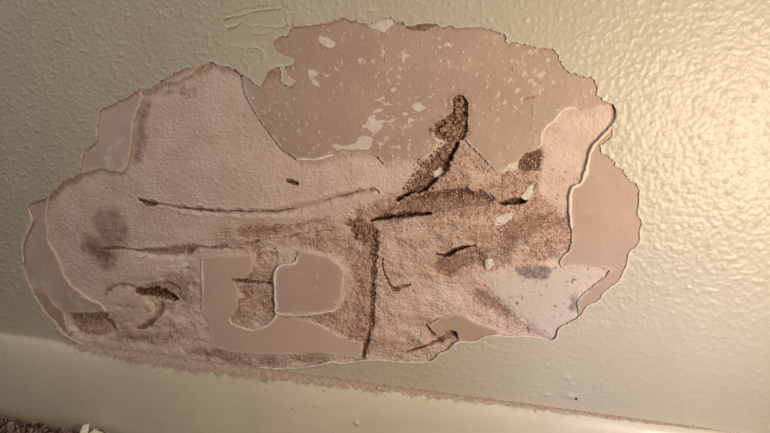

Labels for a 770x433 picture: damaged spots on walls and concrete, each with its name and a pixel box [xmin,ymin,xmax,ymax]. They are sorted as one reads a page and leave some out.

crack [139,198,159,207]
crack [181,206,295,214]
flaking render [47,5,643,370]
crack [395,142,460,201]
crack [363,230,411,358]
crack [407,330,456,352]